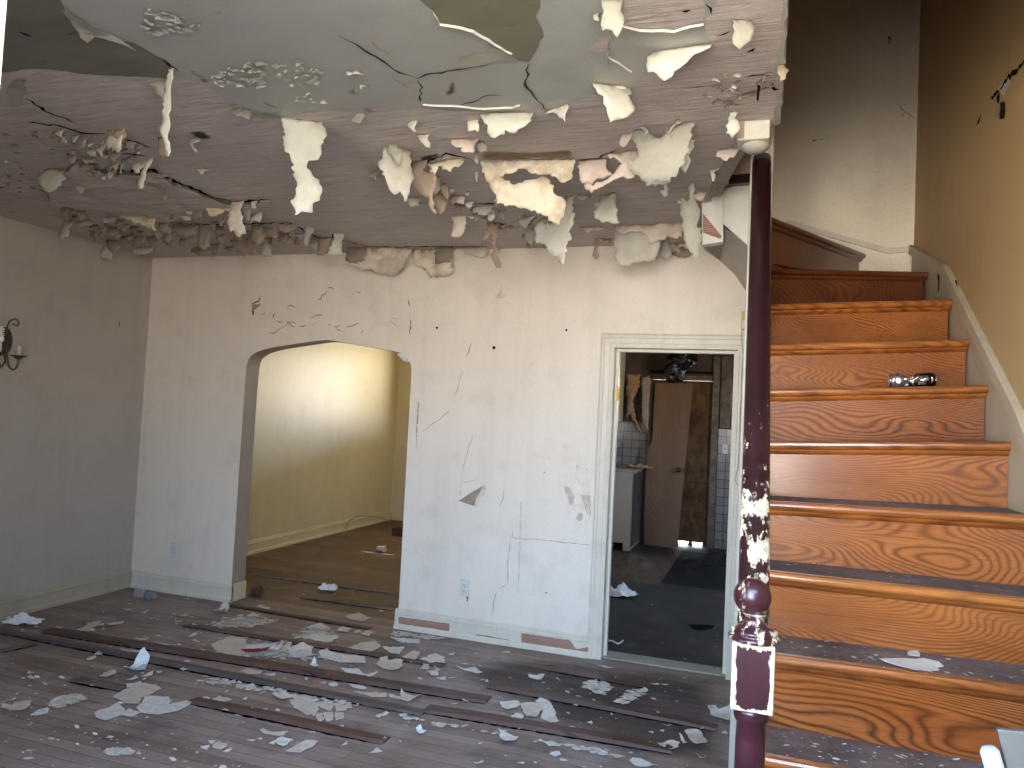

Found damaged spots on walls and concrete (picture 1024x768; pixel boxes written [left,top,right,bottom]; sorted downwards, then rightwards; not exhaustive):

crack [339,36,488,102]
crack [523,64,545,110]
crack [976,60,1024,125]
flaking render [0,0,789,278]
crack [26,98,488,248]
peeling [459,486,486,506]
peeling [564,464,591,521]
crack [492,491,590,614]
peeling [398,617,449,631]
peeling [521,633,588,652]